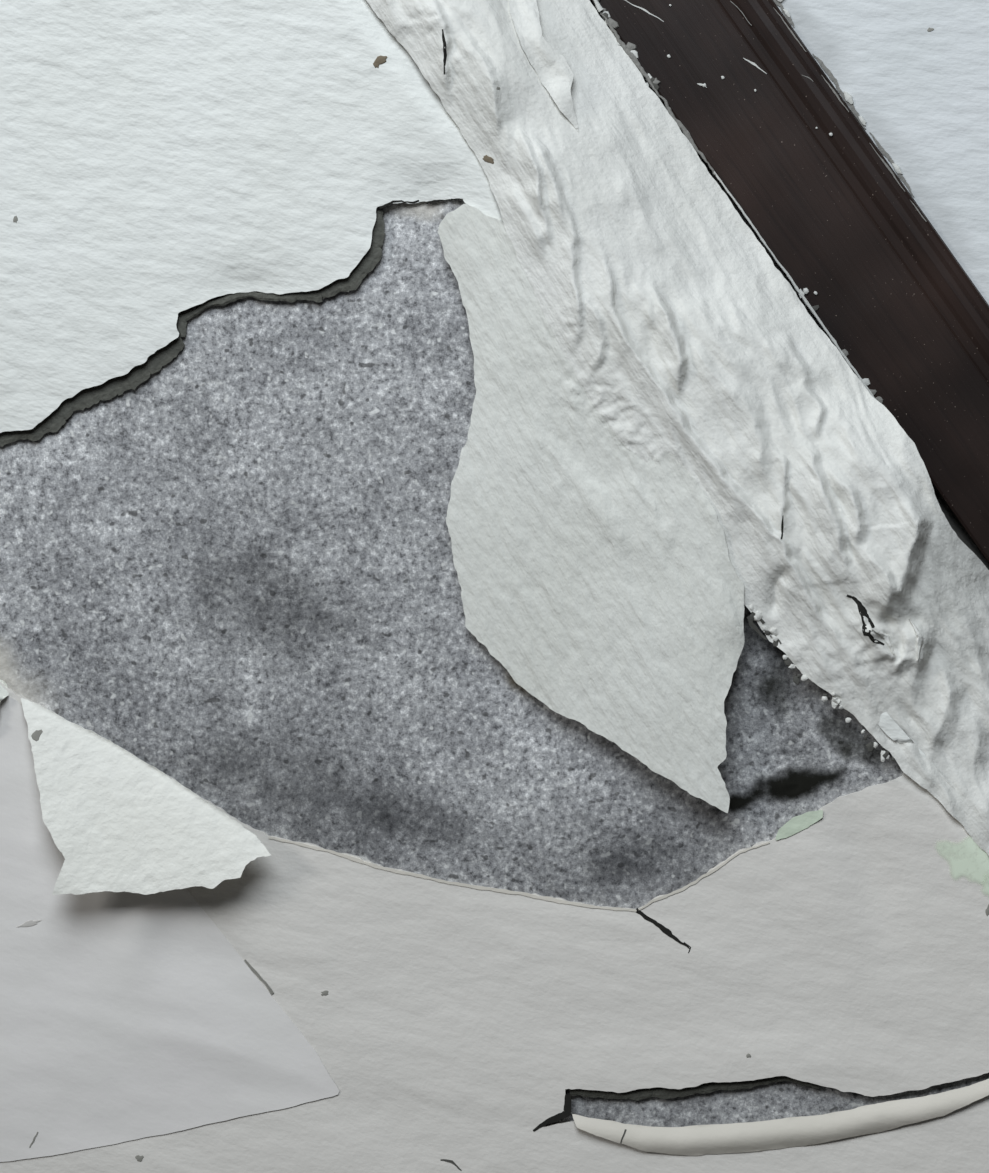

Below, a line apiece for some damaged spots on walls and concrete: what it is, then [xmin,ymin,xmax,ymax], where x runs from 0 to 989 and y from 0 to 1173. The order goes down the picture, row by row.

peeling [0,199,904,1162]
water stain [824,720,880,759]
water stain [716,768,843,812]
crack [636,908,691,953]
spalling [545,1073,989,1127]